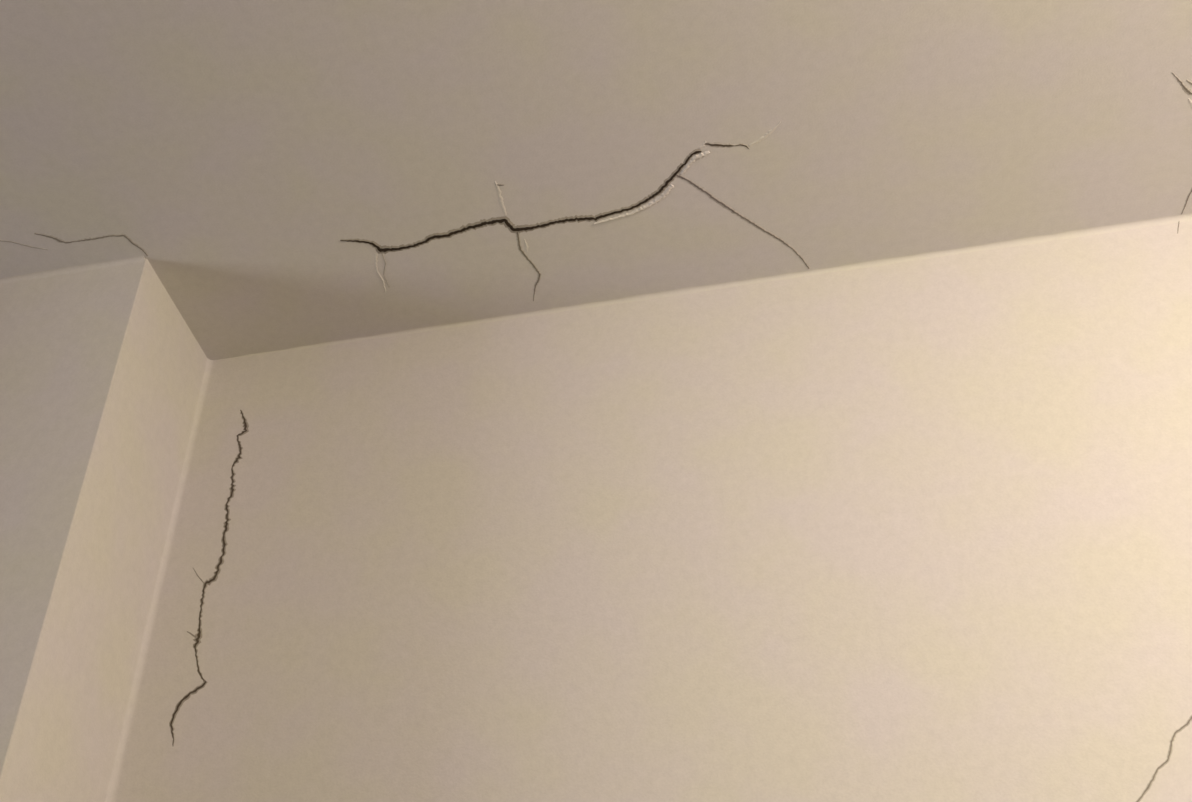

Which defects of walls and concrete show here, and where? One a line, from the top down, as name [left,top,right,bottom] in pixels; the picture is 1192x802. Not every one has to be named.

crack [1172,72,1192,109]
crack [0,233,148,256]
crack [340,122,810,301]
crack [1177,188,1192,233]
crack [169,410,249,746]
crack [1136,715,1192,802]